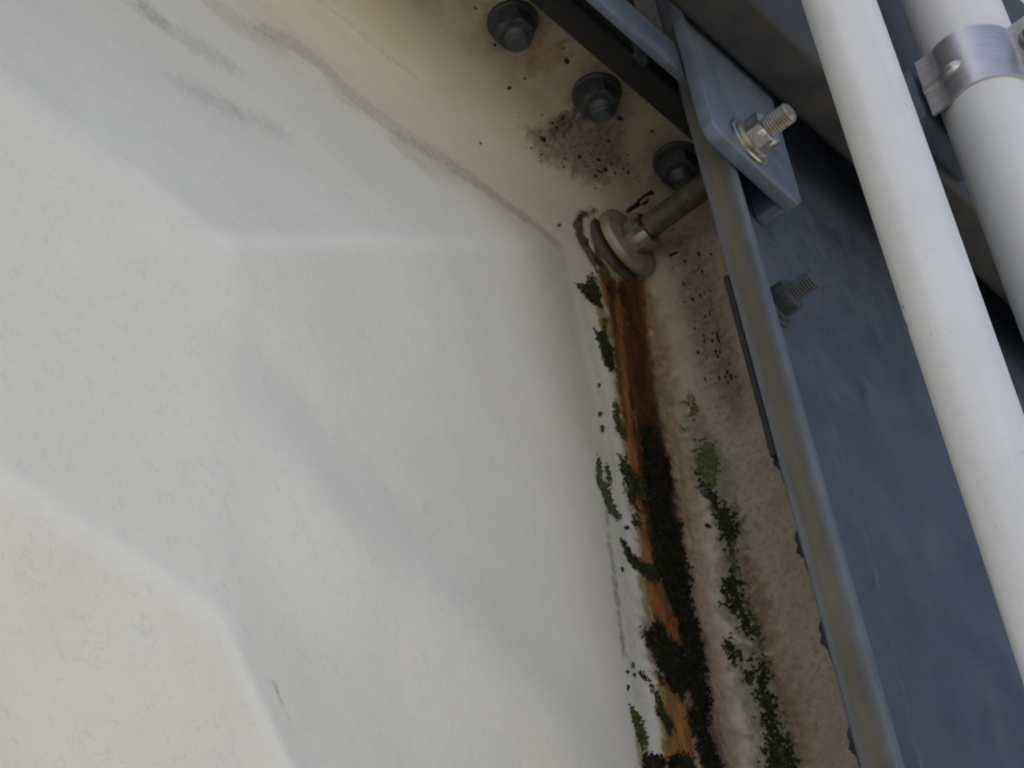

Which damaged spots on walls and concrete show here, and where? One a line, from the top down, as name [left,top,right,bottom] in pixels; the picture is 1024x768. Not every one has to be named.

water stain [525,108,641,189]
corrosion [557,209,735,768]
water stain [689,91,883,768]